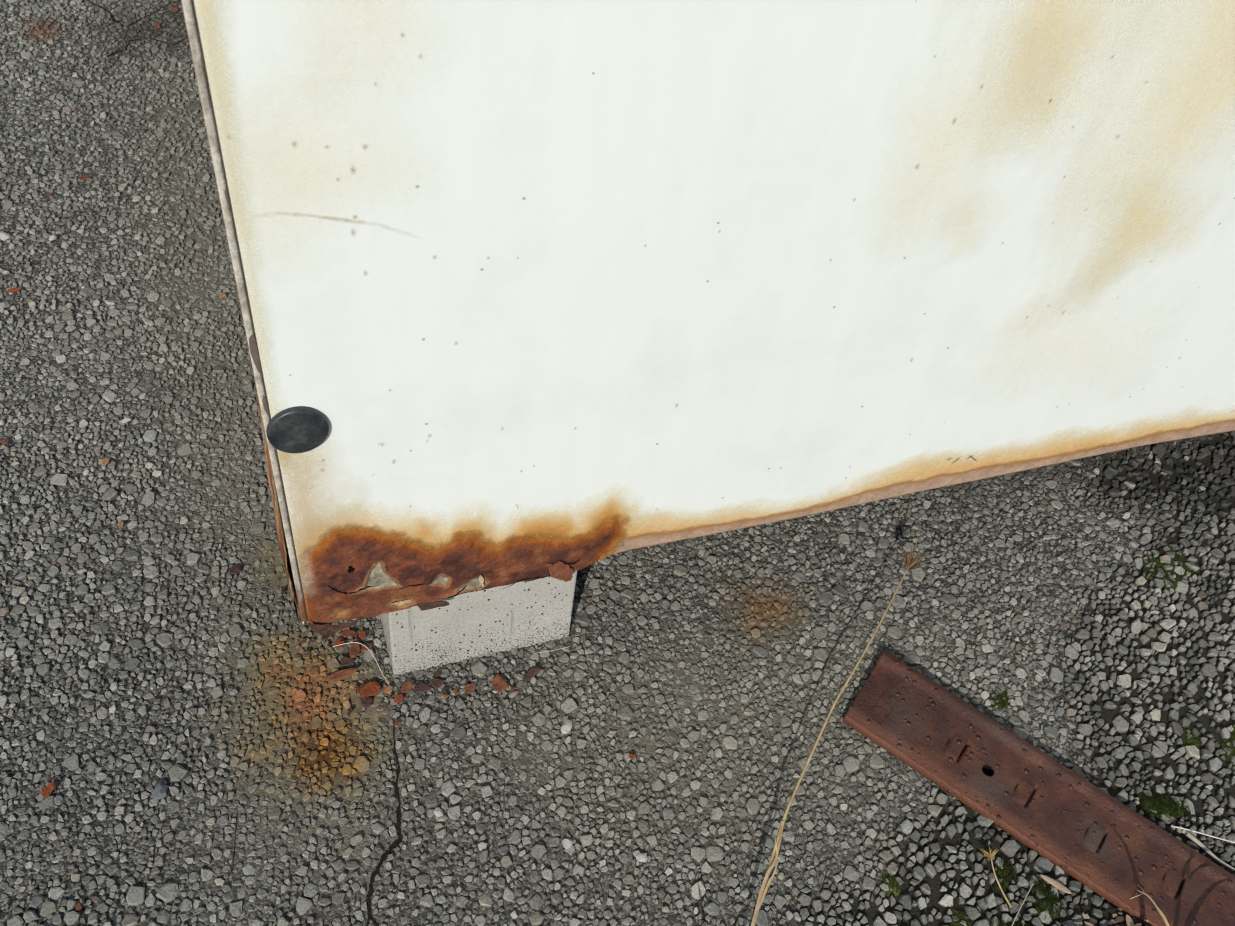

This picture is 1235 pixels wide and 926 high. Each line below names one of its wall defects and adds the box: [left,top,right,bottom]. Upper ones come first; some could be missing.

rust [226,623,476,792]
rust [492,663,541,697]
crack [366,726,402,926]